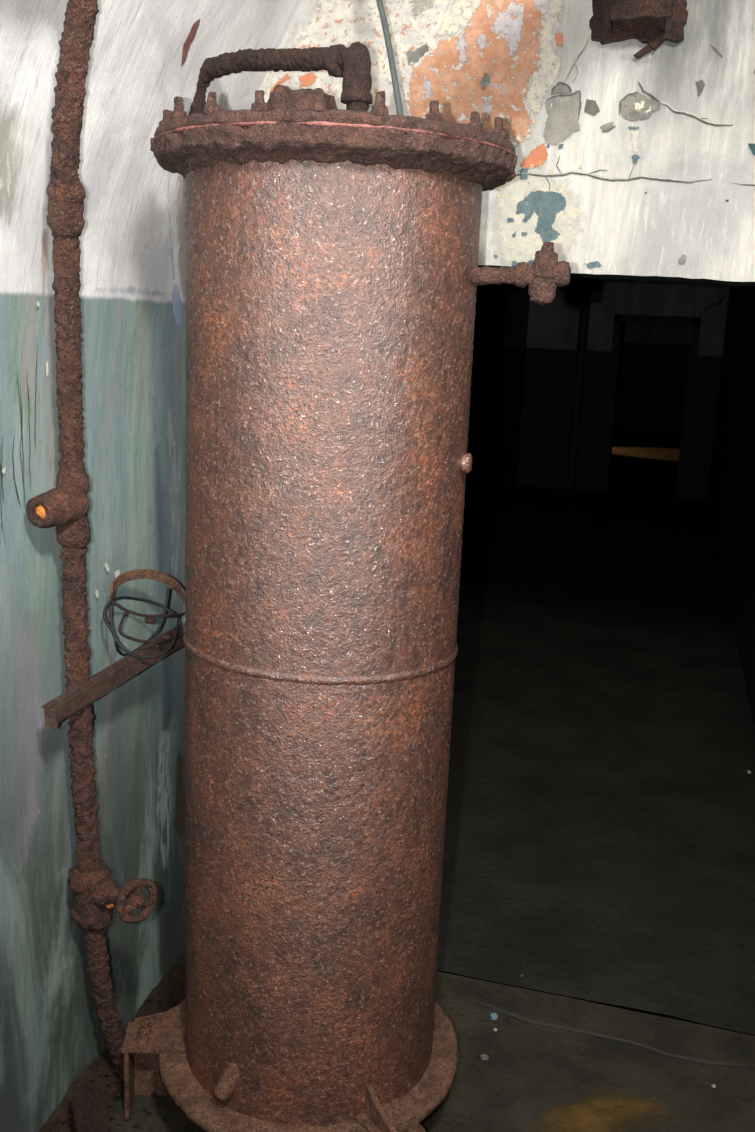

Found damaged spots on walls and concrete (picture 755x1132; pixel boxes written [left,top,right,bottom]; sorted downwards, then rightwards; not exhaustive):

crack [564,35,591,83]
peeling [264,70,346,110]
crack [638,82,733,126]
peeling [284,0,660,266]
crack [516,156,755,190]